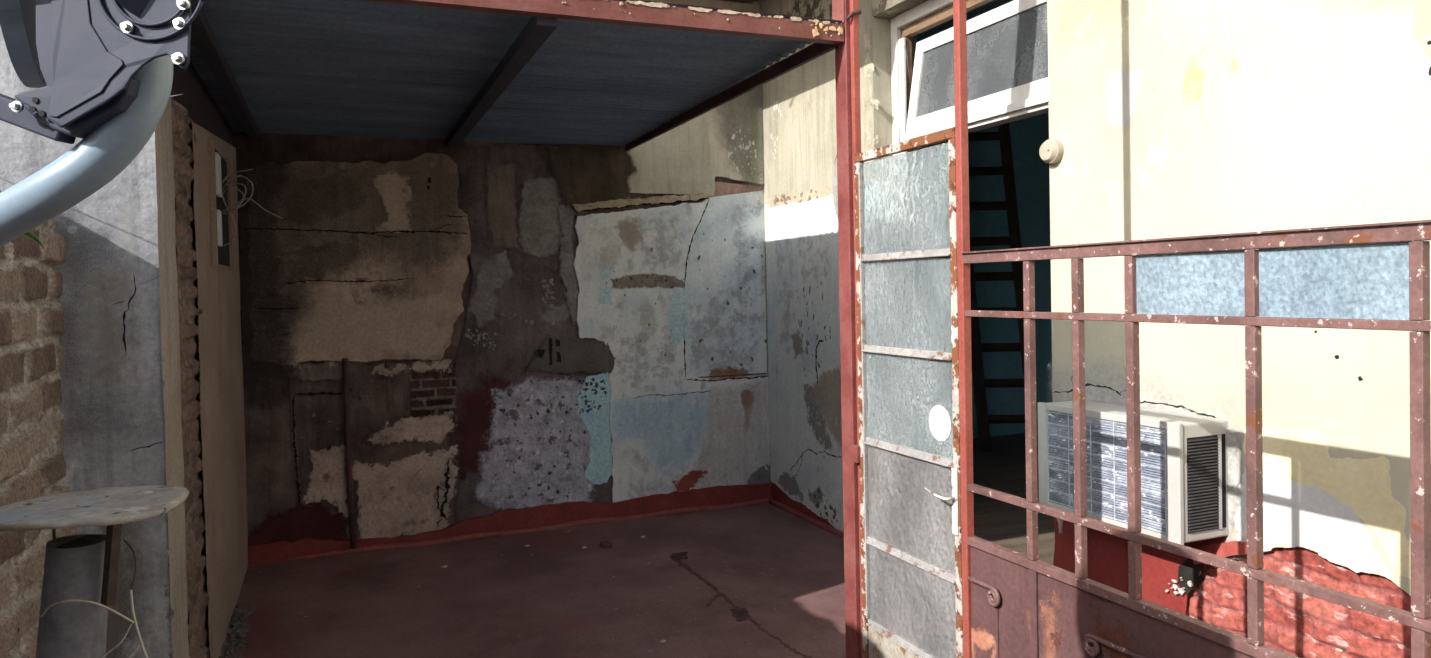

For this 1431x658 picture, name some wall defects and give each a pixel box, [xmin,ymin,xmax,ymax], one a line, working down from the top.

peeling [619,0,843,37]
peeling [860,0,886,151]
peeling [1060,157,1096,184]
crack [89,268,159,360]
flaking render [410,145,838,524]
crack [1052,376,1216,418]
crack [436,457,451,530]
flaking render [1187,427,1413,658]